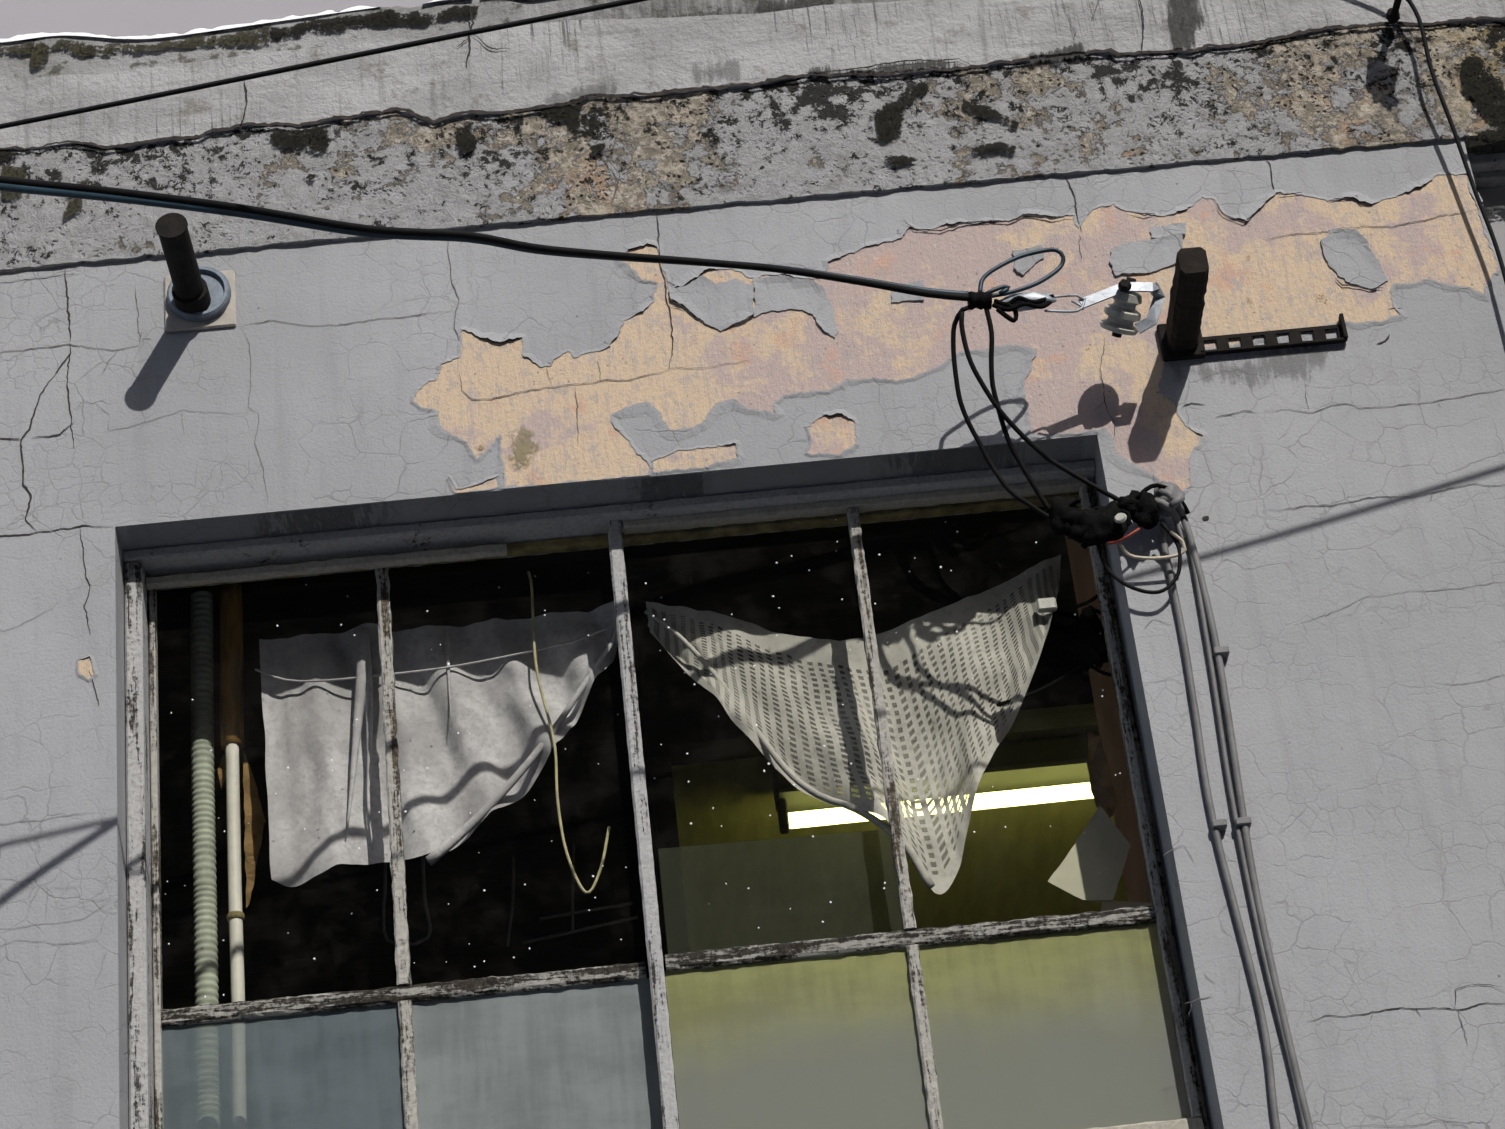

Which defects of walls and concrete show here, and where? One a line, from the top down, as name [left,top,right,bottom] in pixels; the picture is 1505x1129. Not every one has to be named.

leakage [629,0,835,19]
leakage [1168,0,1204,50]
leakage [1029,42,1087,64]
leakage [538,102,606,154]
leakage [809,59,962,166]
leakage [962,98,1019,154]
leakage [1455,51,1505,155]
peeling [410,171,1501,494]
crack [1182,389,1502,416]
crack [1268,483,1505,510]
peeling [75,655,99,683]
crack [1311,984,1505,1041]